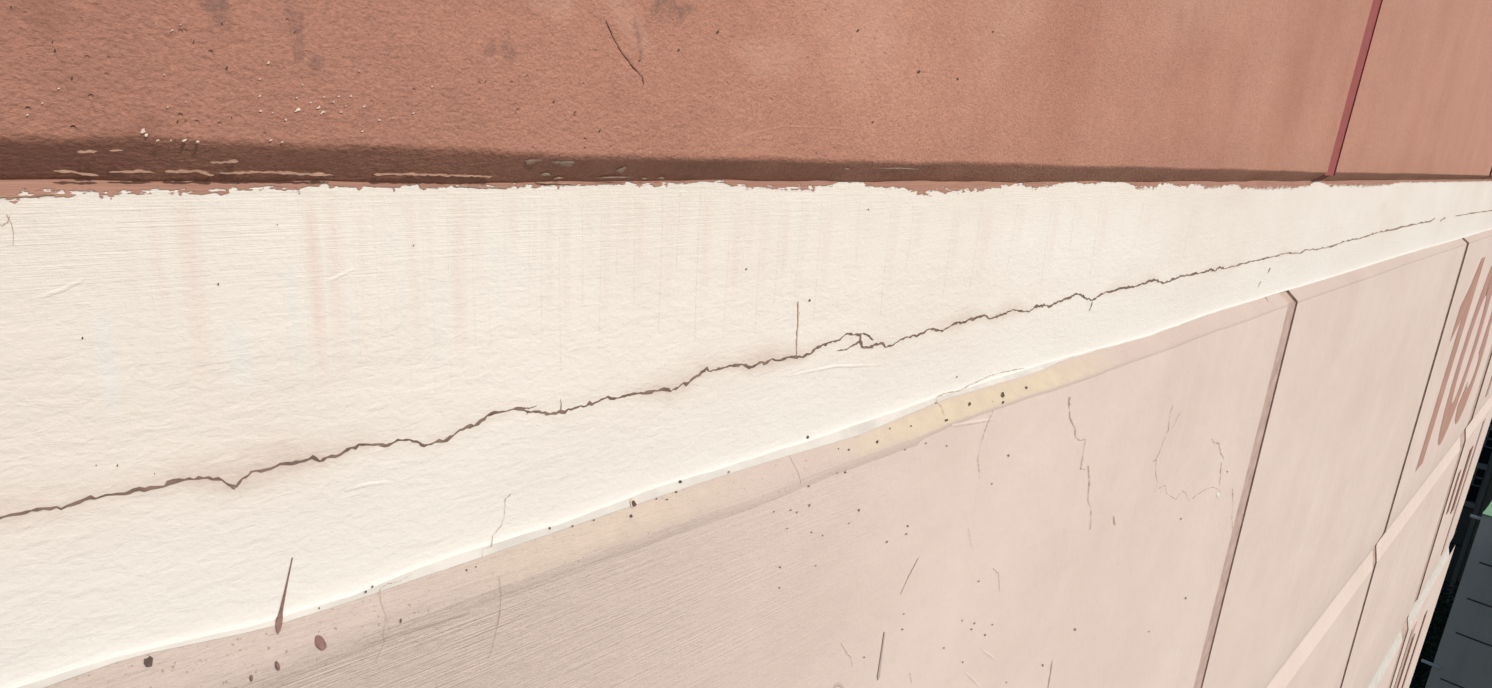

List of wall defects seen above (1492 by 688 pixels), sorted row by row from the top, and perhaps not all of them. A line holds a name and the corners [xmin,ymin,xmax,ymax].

crack [0,210,1492,530]